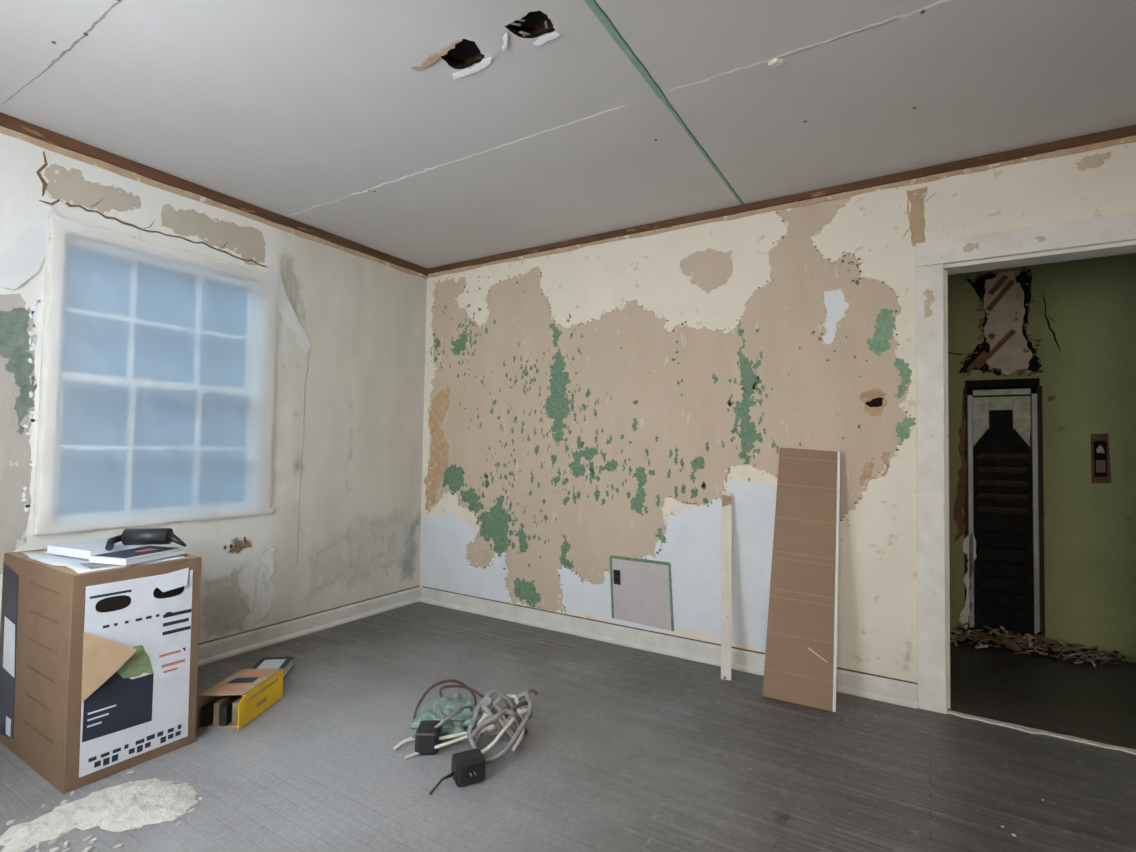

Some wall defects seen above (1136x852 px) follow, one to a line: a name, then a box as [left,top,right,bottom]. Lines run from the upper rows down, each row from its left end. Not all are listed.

peeling [44,162,141,215]
peeling [160,203,267,265]
peeling [899,185,930,247]
flaking render [959,267,1044,376]
flaking render [0,292,41,575]
peeling [420,197,916,652]